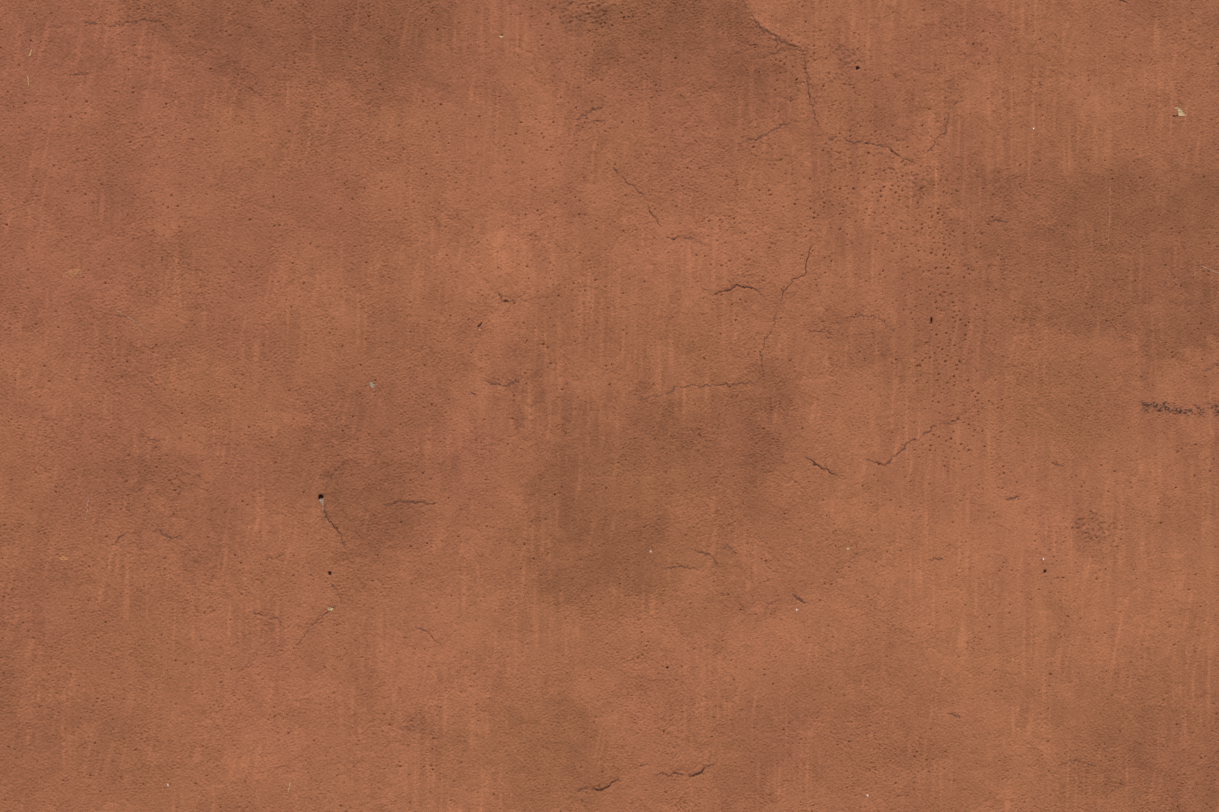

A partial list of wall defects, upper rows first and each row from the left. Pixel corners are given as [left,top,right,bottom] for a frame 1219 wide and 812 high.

crack [736,0,954,164]
crack [324,464,346,548]
crack [385,499,435,507]